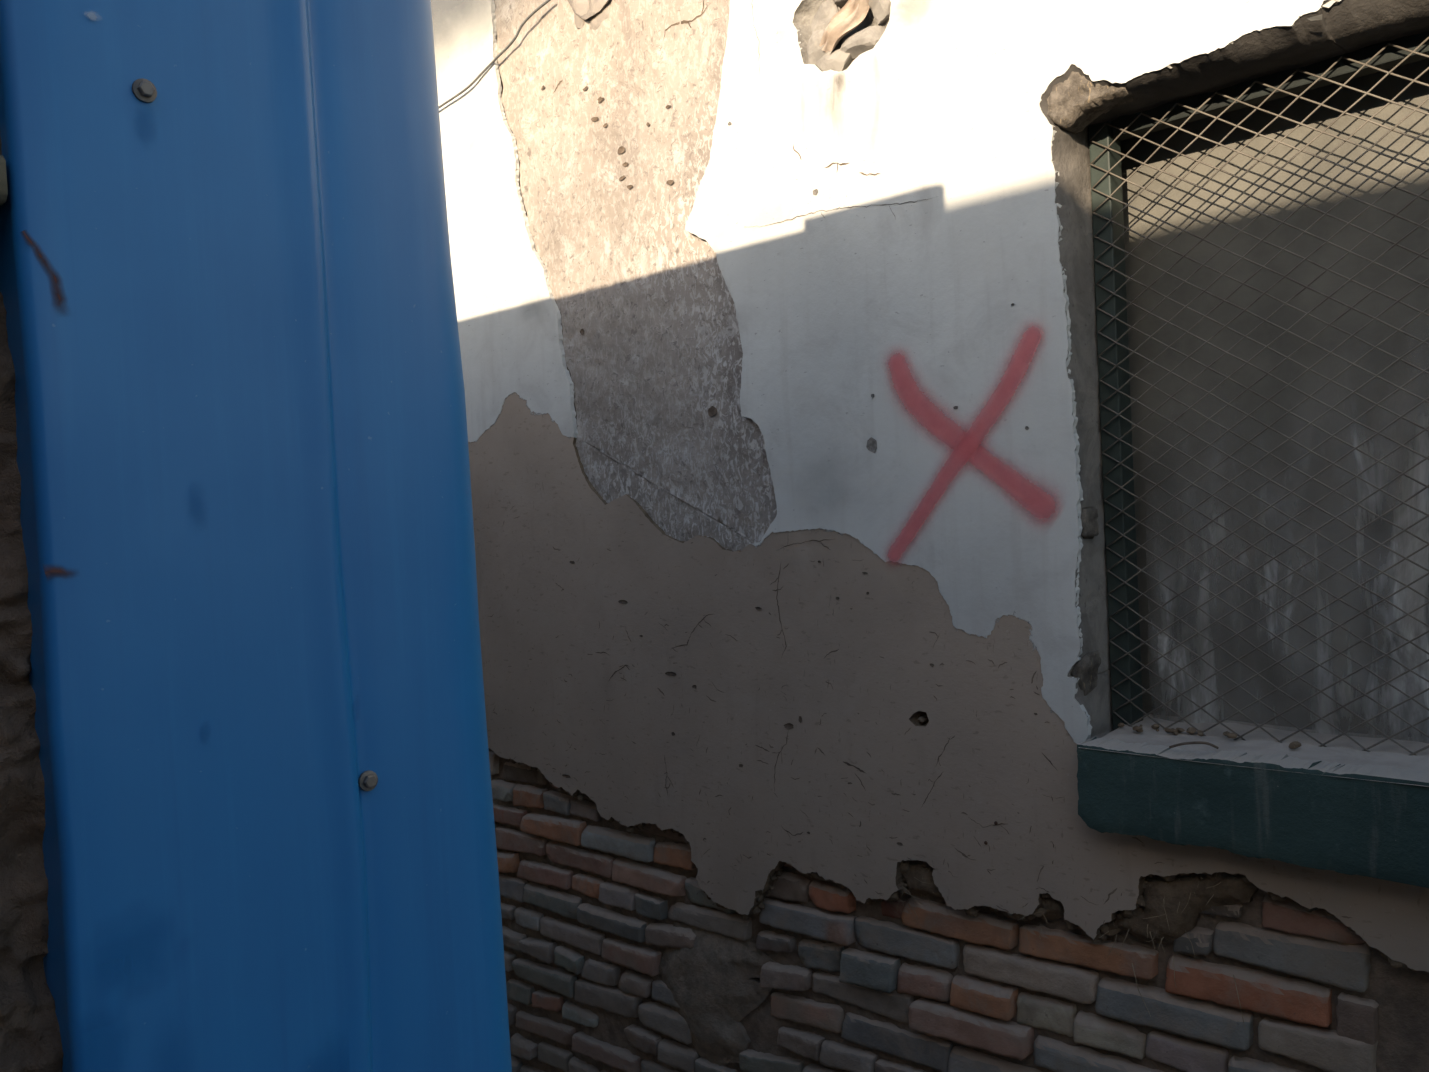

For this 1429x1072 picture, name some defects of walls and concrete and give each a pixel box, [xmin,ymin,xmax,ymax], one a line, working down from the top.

crack [753,146,932,227]
flaking render [468,0,1429,1072]
crack [487,539,1122,925]